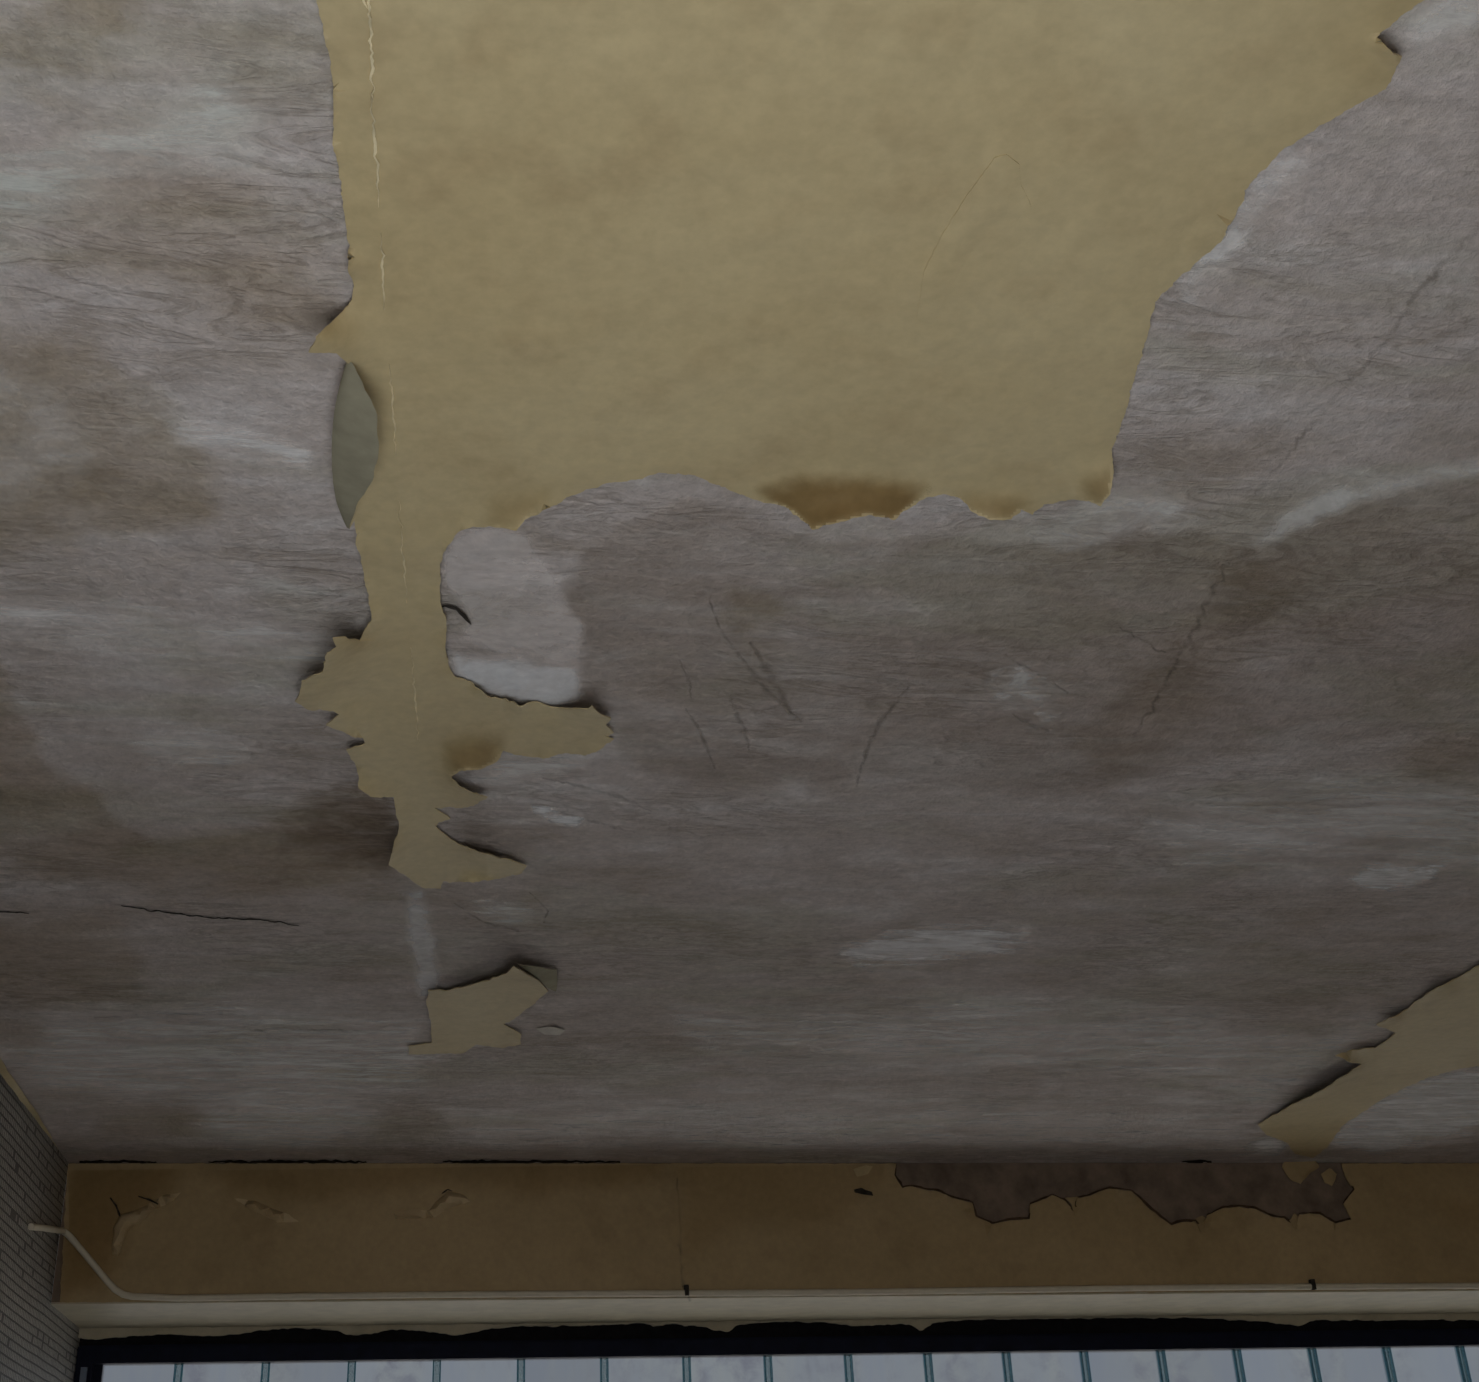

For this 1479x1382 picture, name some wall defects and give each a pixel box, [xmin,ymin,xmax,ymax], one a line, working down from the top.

peeling [295,0,1424,889]
crack [121,905,299,926]
peeling [408,964,566,1055]
peeling [0,1058,58,1149]
peeling [894,965,1479,1232]